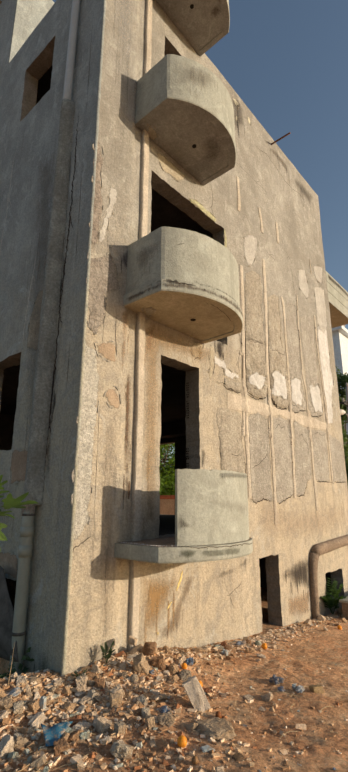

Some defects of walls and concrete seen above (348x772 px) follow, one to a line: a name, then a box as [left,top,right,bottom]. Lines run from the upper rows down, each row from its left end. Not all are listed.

crack [43,113,79,491]
spalling [70,143,121,540]
peeling [208,265,334,425]
water stain [286,563,309,601]